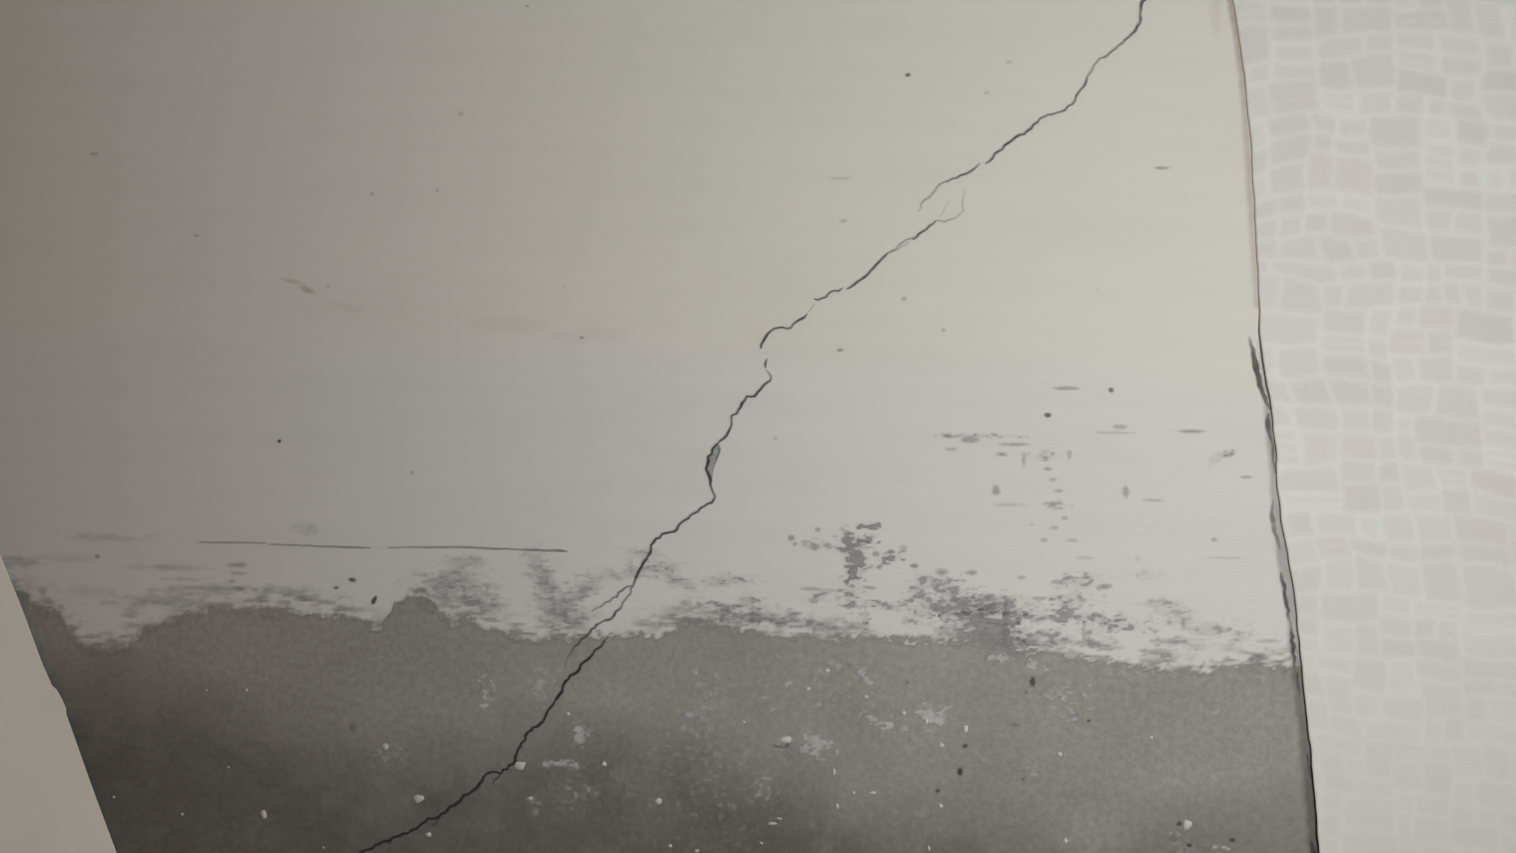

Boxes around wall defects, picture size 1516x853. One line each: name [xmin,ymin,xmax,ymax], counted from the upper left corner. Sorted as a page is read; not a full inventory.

crack [950,0,1146,180]
crack [1251,346,1272,439]
crack [359,220,937,853]
crack [1281,580,1296,659]
damp [71,725,807,853]